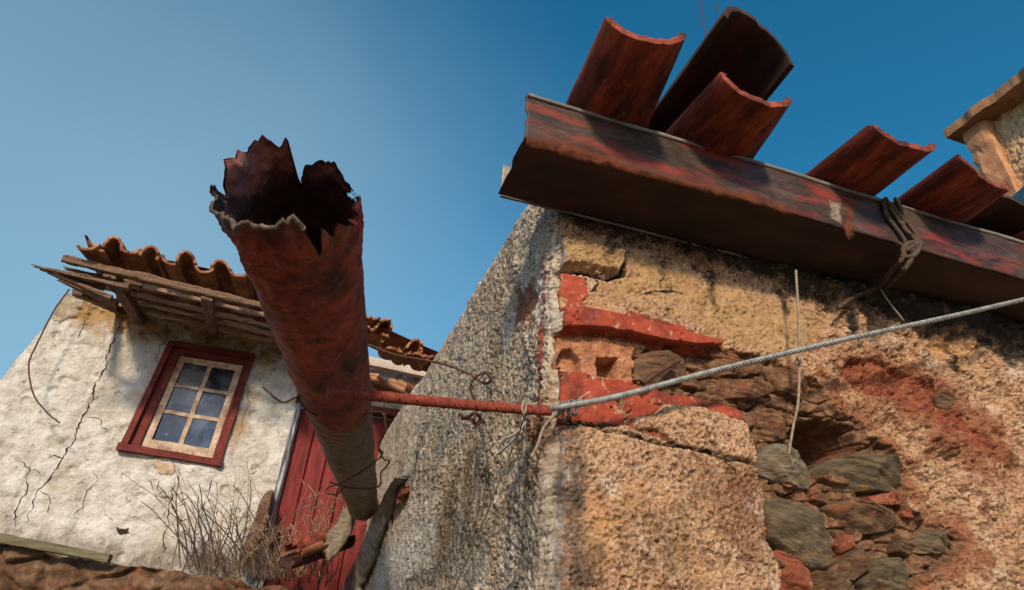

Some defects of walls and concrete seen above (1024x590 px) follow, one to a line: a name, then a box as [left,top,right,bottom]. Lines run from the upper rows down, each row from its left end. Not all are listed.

corrosion [713,187,786,211]
crack [14,314,123,526]
spalling [325,273,965,590]
crack [558,421,756,474]
spalling [840,356,995,450]